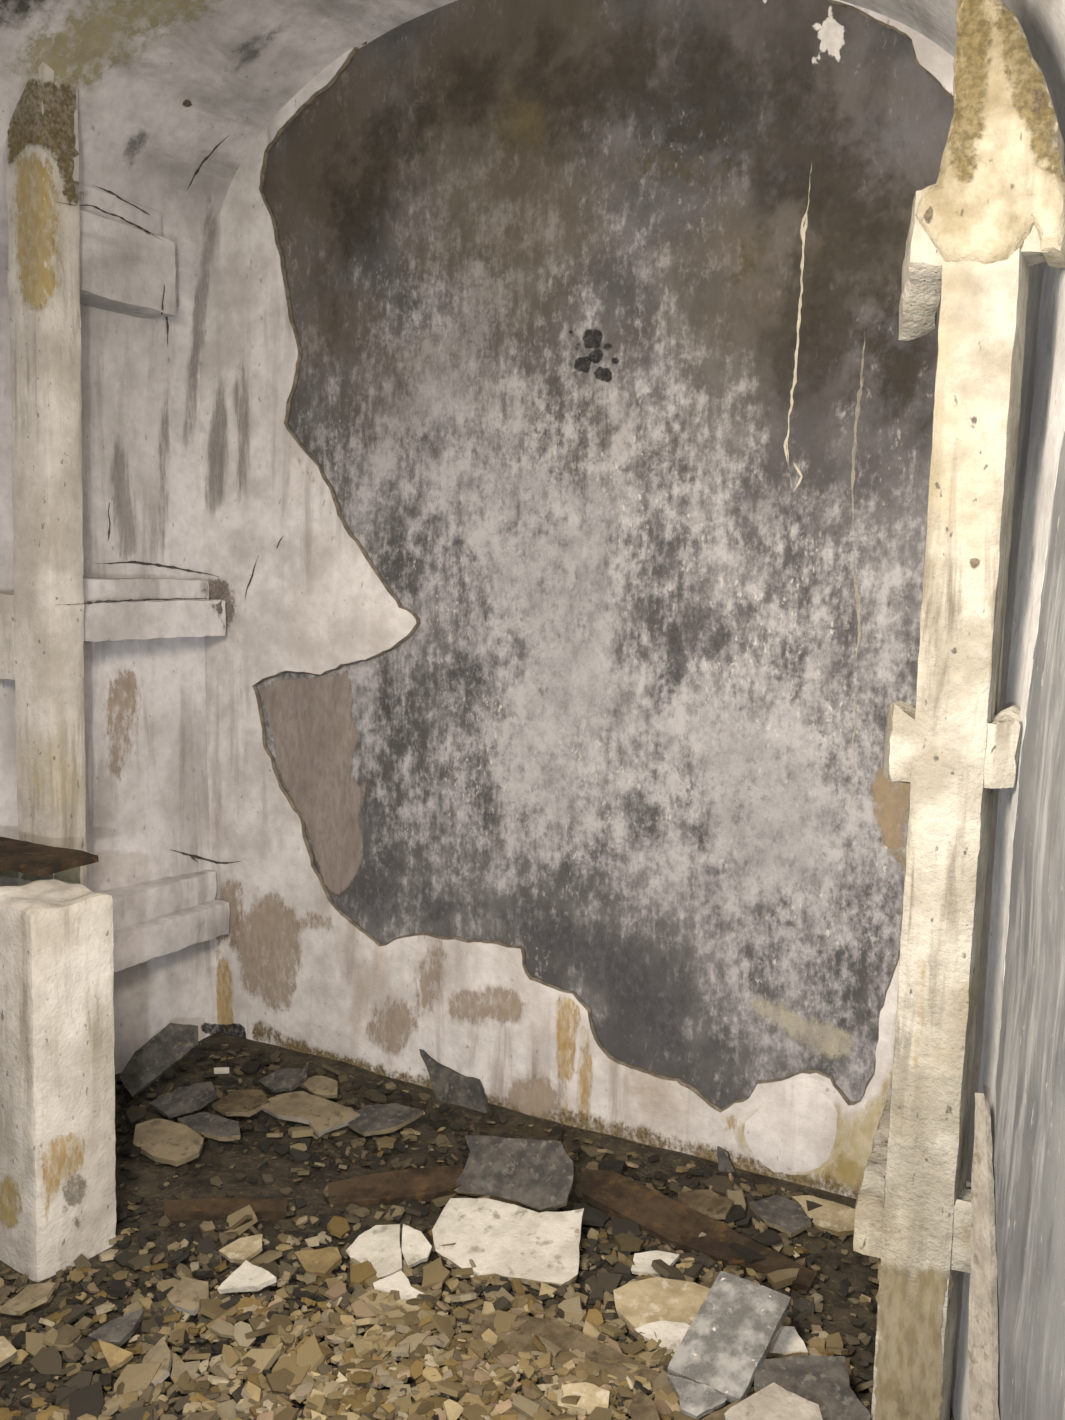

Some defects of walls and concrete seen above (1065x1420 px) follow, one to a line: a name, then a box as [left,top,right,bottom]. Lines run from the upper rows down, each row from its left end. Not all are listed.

leakage [28,0,207,87]
crack [59,185,162,240]
crack [187,137,227,190]
leakage [515,34,911,394]
crack [784,166,812,491]
flaking render [253,0,954,1112]
crack [850,584,861,803]
leakage [201,1023,246,1039]
leakage [220,880,331,1009]
leakage [369,950,443,1054]
leakage [450,987,522,1022]
flaking render [993,432,1065,1420]